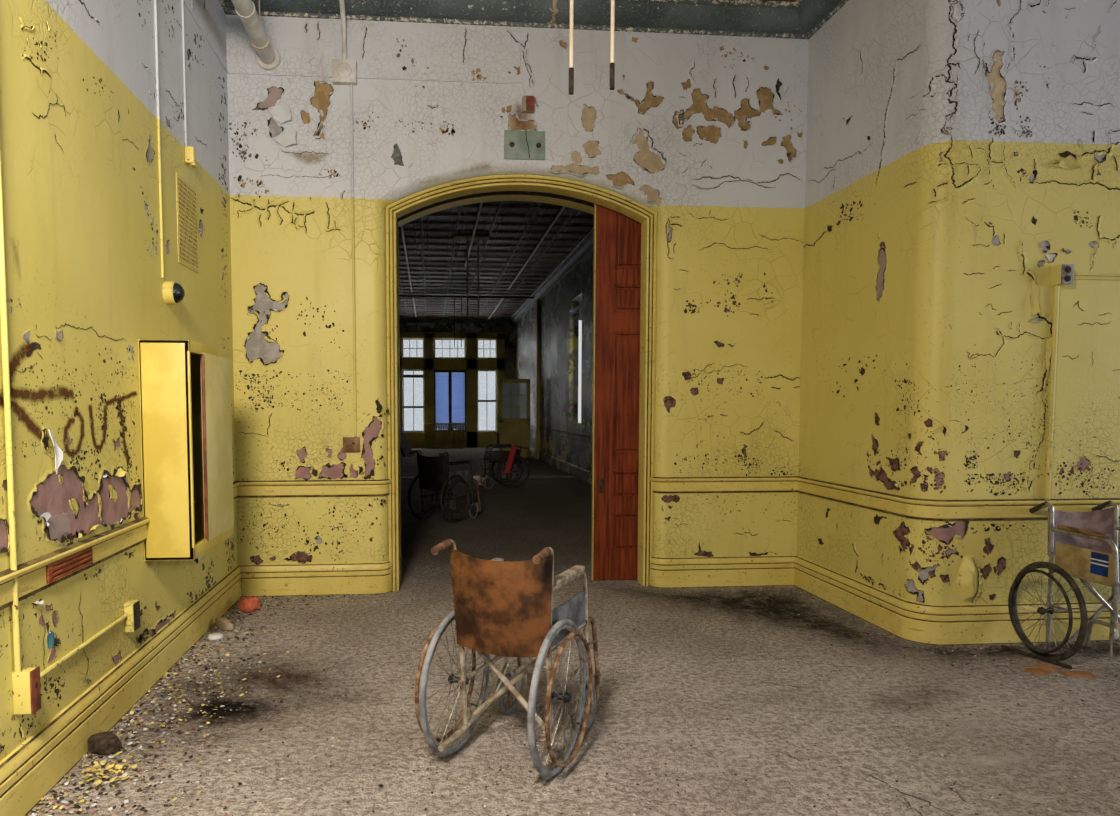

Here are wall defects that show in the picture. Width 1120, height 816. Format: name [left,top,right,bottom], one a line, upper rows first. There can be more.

peeling [217,76,336,304]
peeling [549,46,803,206]
crack [630,0,1120,492]
peeling [982,49,1032,138]
peeling [1012,152,1038,184]
peeling [235,282,350,413]
peeling [15,330,142,547]
peeling [276,398,389,481]
peeling [0,516,10,556]
peeling [874,515,1025,604]